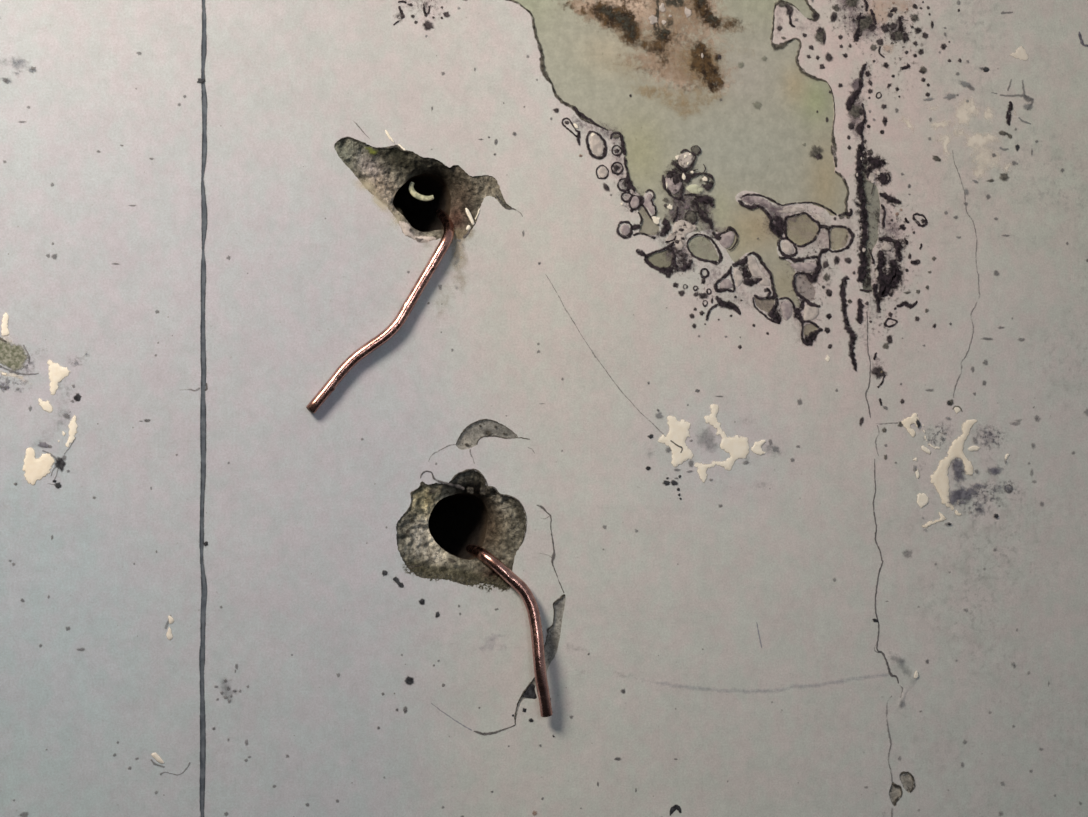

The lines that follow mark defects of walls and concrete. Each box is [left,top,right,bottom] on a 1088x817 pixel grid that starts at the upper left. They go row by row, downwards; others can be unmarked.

spalling [334,123,523,243]
peeling [506,0,850,313]
peeling [862,158,881,293]
spalling [932,79,1033,183]
spalling [0,312,81,412]
spalling [14,414,78,488]
spalling [396,419,528,591]
spalling [648,404,778,500]
crack [865,317,903,697]
spalling [901,413,1013,530]